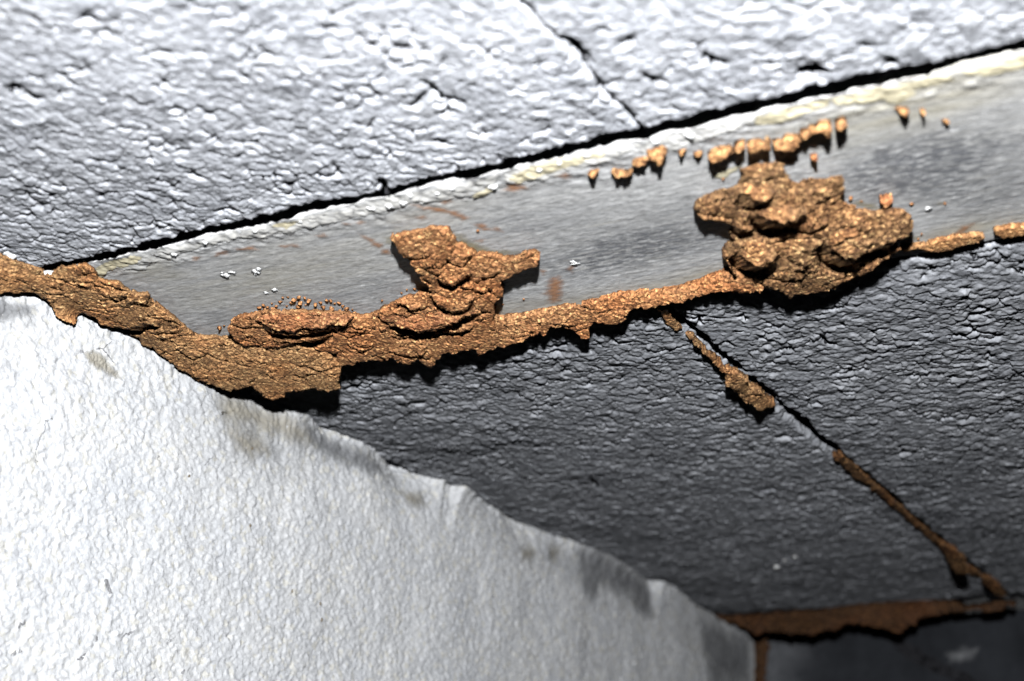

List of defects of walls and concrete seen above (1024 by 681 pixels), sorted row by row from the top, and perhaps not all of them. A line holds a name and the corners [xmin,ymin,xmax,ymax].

crack [87,13,111,32]
crack [620,35,635,44]
crack [560,34,607,87]
crack [701,51,725,65]
crack [643,73,663,82]
crack [401,79,460,112]
crack [377,178,390,196]
crack [969,252,1023,274]